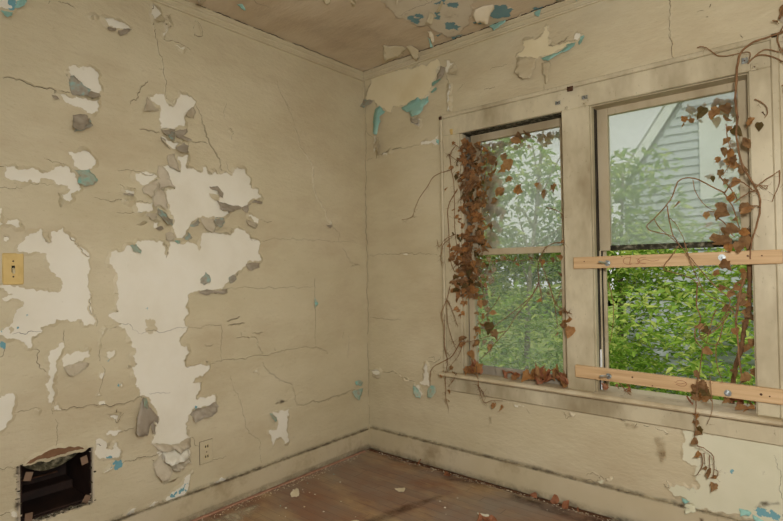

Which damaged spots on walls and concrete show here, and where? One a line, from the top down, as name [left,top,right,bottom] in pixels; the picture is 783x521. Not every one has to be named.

peeling [380,0,522,48]
crack [364,0,565,91]
peeling [514,24,584,83]
peeling [2,63,104,132]
peeling [355,45,457,161]
crack [201,118,231,173]
peeling [0,90,272,521]
crack [187,145,442,424]
crack [34,396,142,442]
peeling [266,408,290,447]
peeling [663,429,783,521]
crack [0,509,18,519]